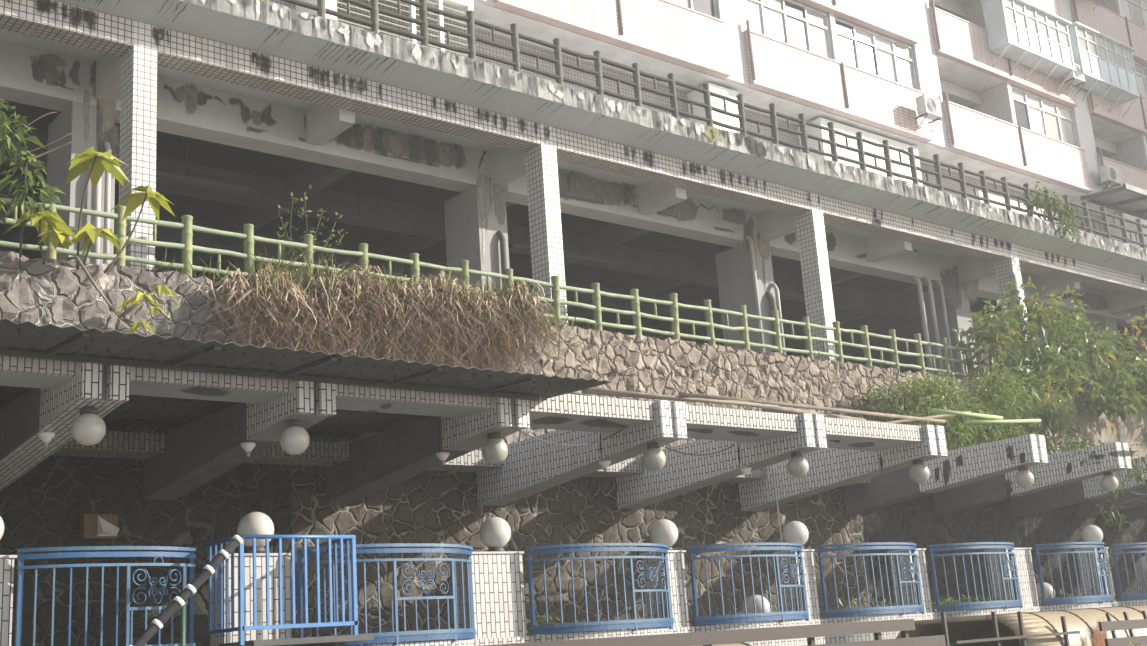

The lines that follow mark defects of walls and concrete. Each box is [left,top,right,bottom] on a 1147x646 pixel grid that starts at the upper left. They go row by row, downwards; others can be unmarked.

peeling [31,54,96,90]
peeling [164,84,277,133]
peeling [329,124,467,169]
peeling [558,170,638,208]
peeling [656,198,745,232]